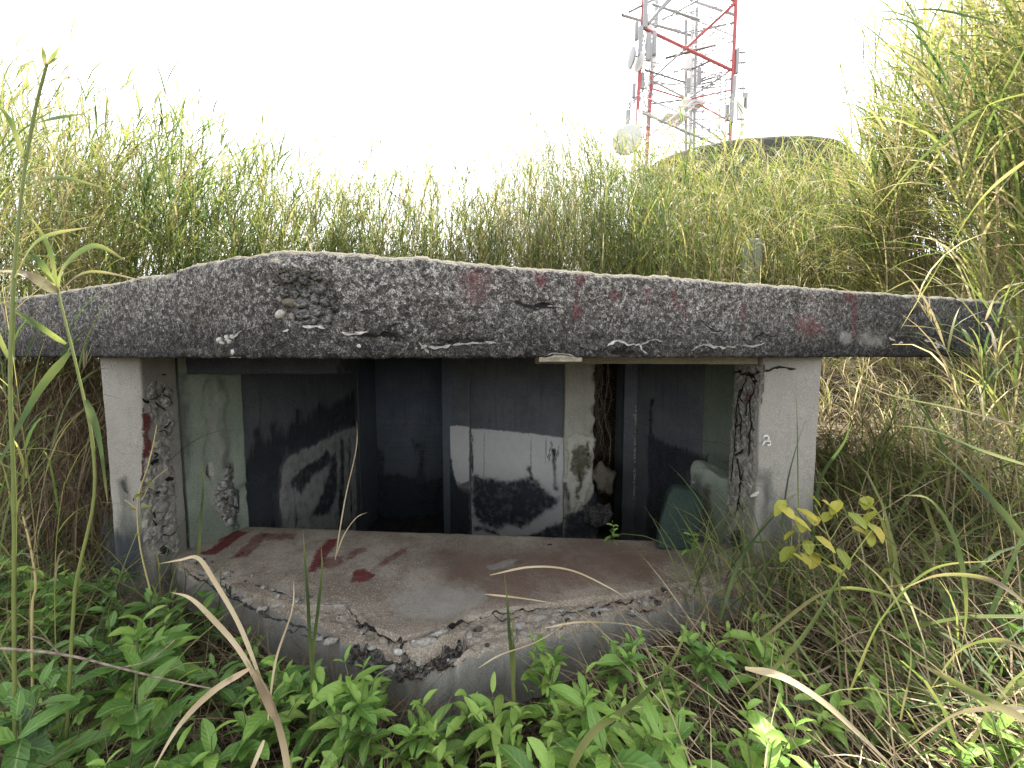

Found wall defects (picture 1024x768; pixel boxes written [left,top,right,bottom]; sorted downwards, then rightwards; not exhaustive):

spalling [274,271,341,332]
crack [515,301,565,310]
spalling [140,380,180,557]
spalling [212,463,238,529]
crack [692,320,795,512]
crack [183,558,696,667]